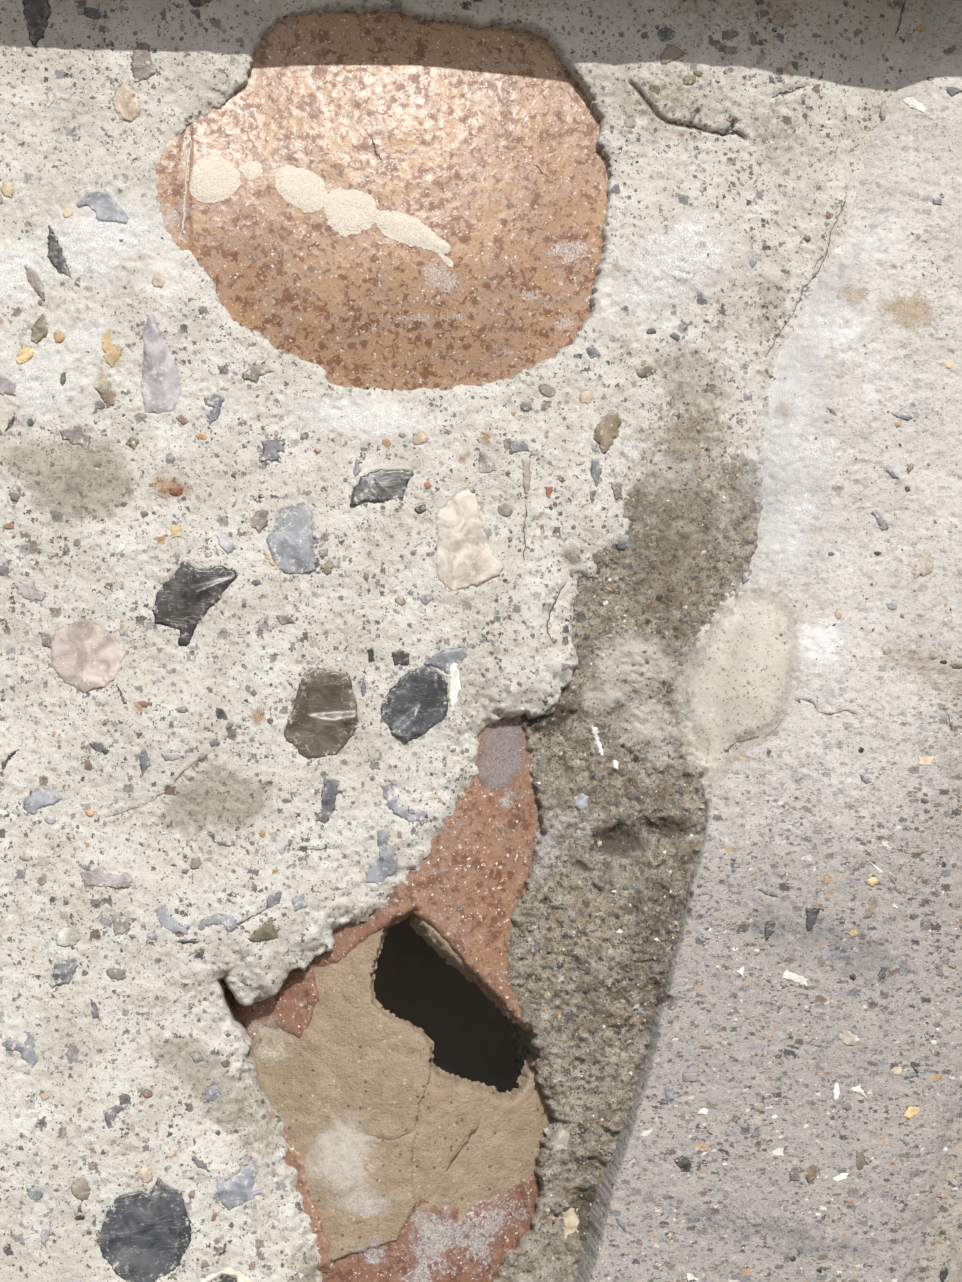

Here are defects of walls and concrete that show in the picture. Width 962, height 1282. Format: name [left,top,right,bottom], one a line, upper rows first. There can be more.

crack [631,83,745,140]
spalling [586,346,600,359]
spalling [509,441,530,455]
damp [622,437,646,459]
damp [522,643,674,736]
damp [533,812,642,874]
spalling [493,447,765,1282]